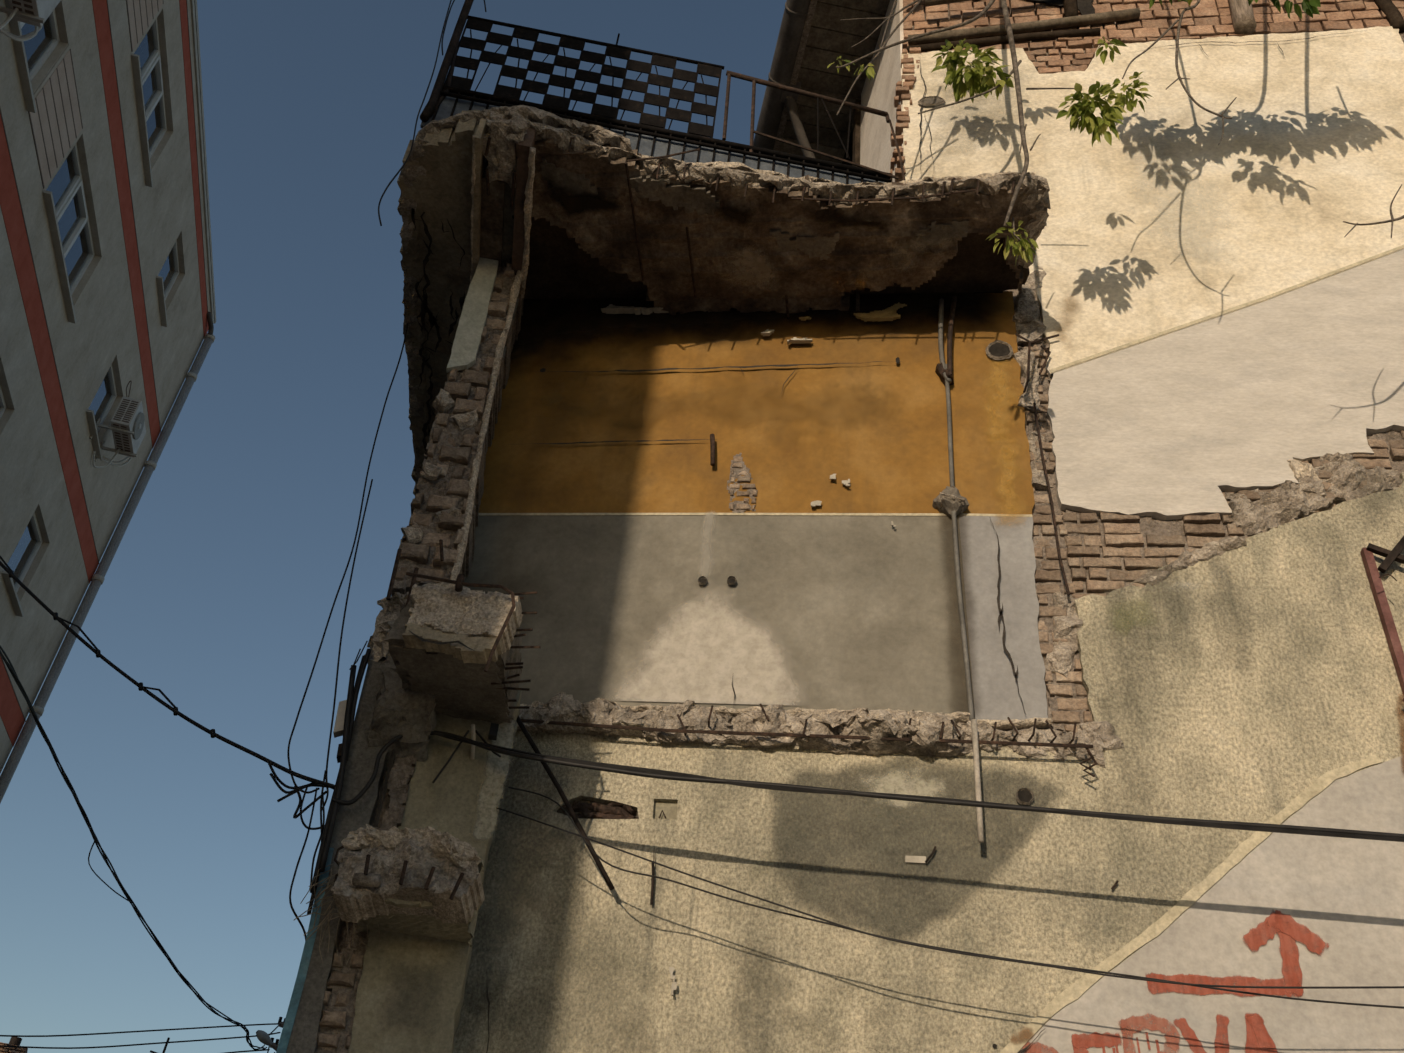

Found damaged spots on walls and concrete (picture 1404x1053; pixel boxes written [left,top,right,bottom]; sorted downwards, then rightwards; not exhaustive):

crack [411,208,466,455]
peeling [601,304,669,315]
peeling [761,329,812,345]
peeling [854,302,907,322]
spalling [727,453,758,513]
spalling [936,266,1124,777]
spalling [406,539,915,741]
crack [990,519,1026,714]
water stain [776,765,1053,937]